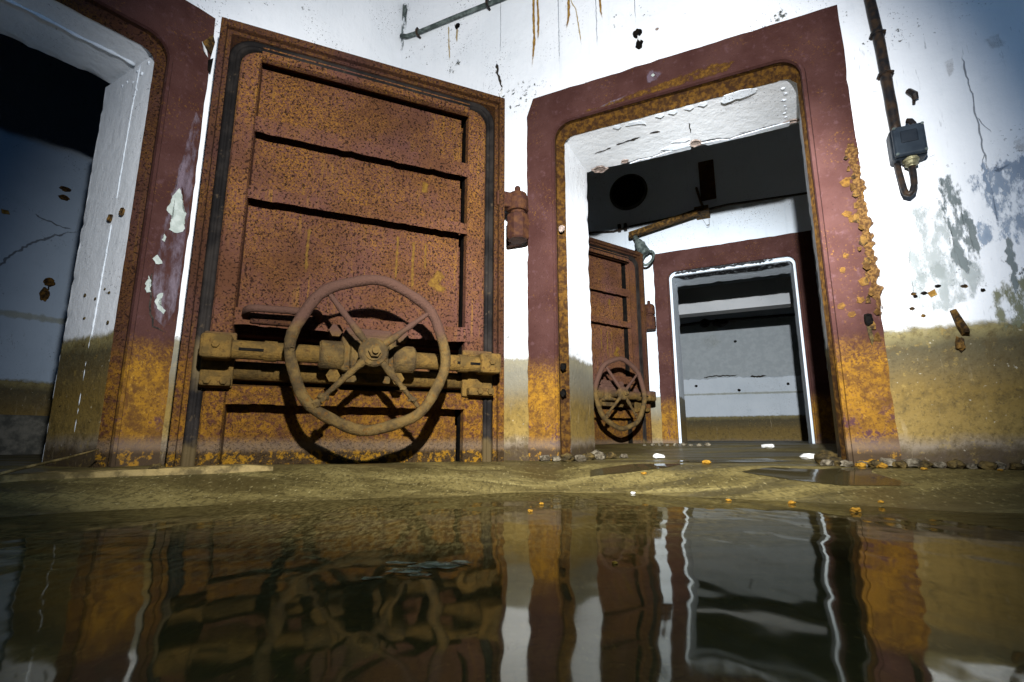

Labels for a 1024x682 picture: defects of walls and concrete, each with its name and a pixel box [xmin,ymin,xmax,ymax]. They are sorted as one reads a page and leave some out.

corrosion [567,0,581,39]
corrosion [587,61,734,111]
crack [963,60,990,163]
peeling [145,132,195,331]
corrosion [629,187,710,238]
corrosion [837,143,885,341]
water stain [884,156,1024,470]